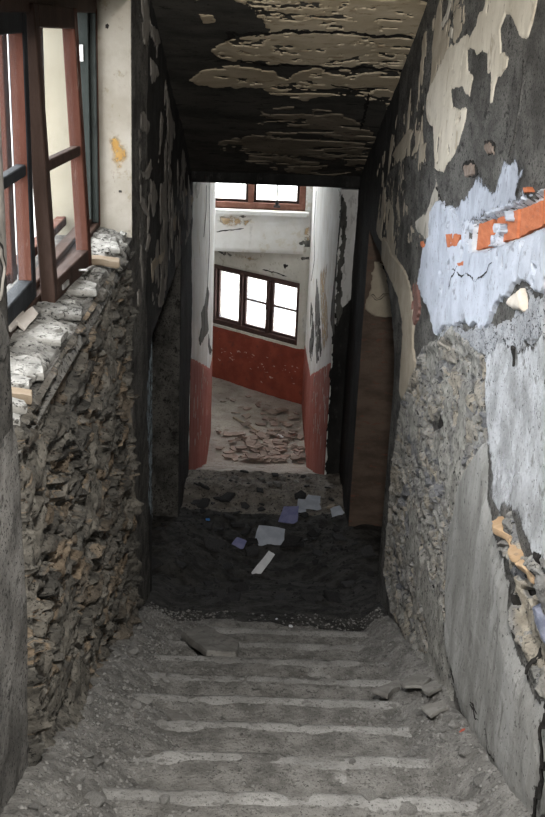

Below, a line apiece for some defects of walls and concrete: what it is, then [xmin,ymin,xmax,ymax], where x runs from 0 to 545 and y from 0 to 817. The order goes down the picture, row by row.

flaking render [15,0,201,767]
flaking render [189,0,545,701]
crack [531,703,545,817]